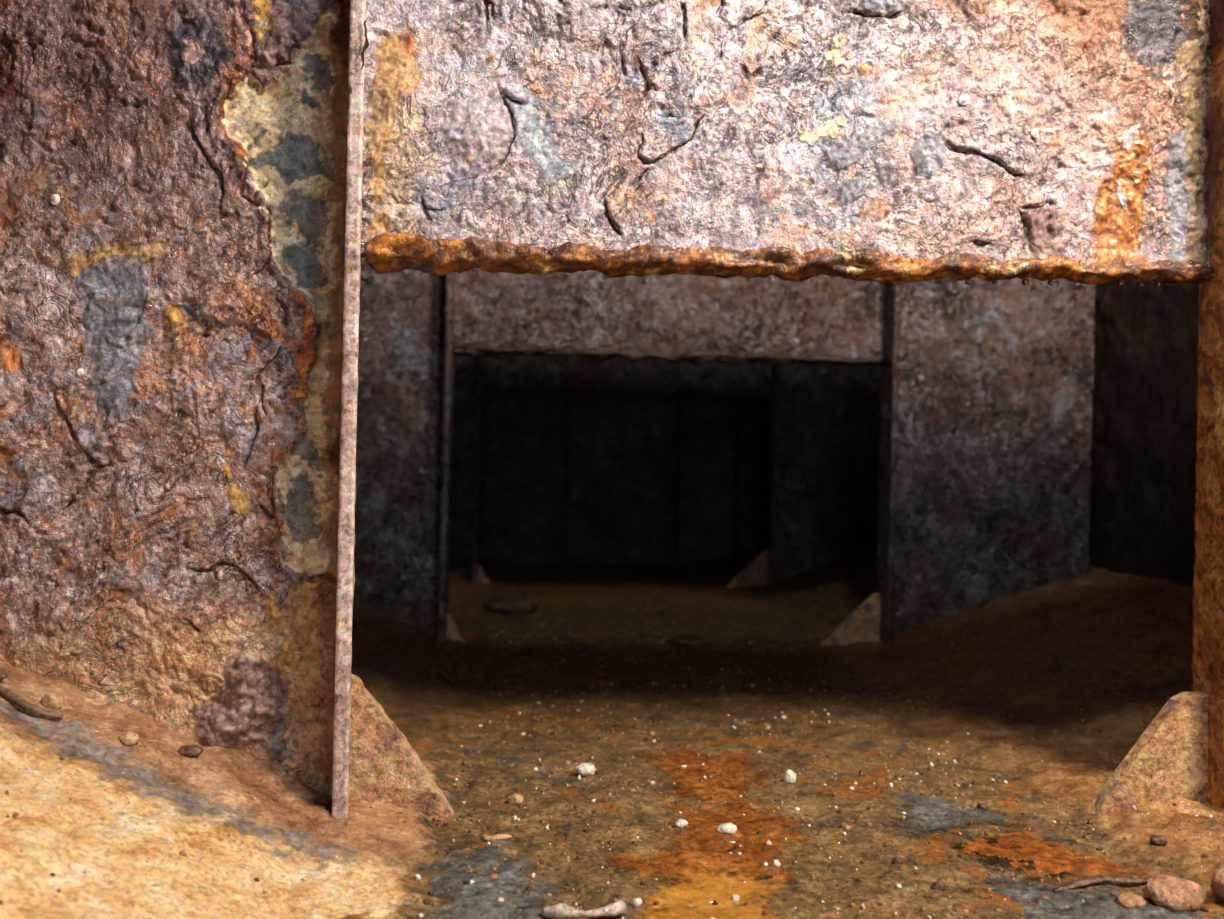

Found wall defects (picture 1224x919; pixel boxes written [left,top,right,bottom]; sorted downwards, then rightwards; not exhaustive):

crack [620,2,687,100]
crack [716,0,763,59]
corrosion [1209,0,1224,46]
crack [485,85,523,175]
crack [605,198,622,236]
crack [637,113,706,182]
crack [941,138,1058,240]
corrosion [1091,124,1153,264]
corrosion [1203,95,1222,250]
crack [188,0,291,536]
peeling [220,0,349,729]
corrosion [1214,390,1224,451]